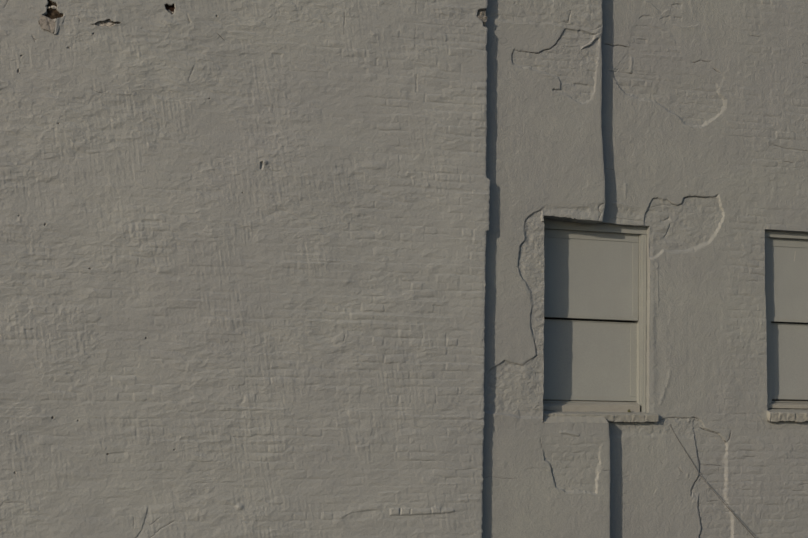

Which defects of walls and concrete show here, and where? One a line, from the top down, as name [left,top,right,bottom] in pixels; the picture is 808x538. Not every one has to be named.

peeling [38,0,64,34]
spalling [477,0,603,105]
spalling [612,25,727,128]
spalling [484,201,651,419]